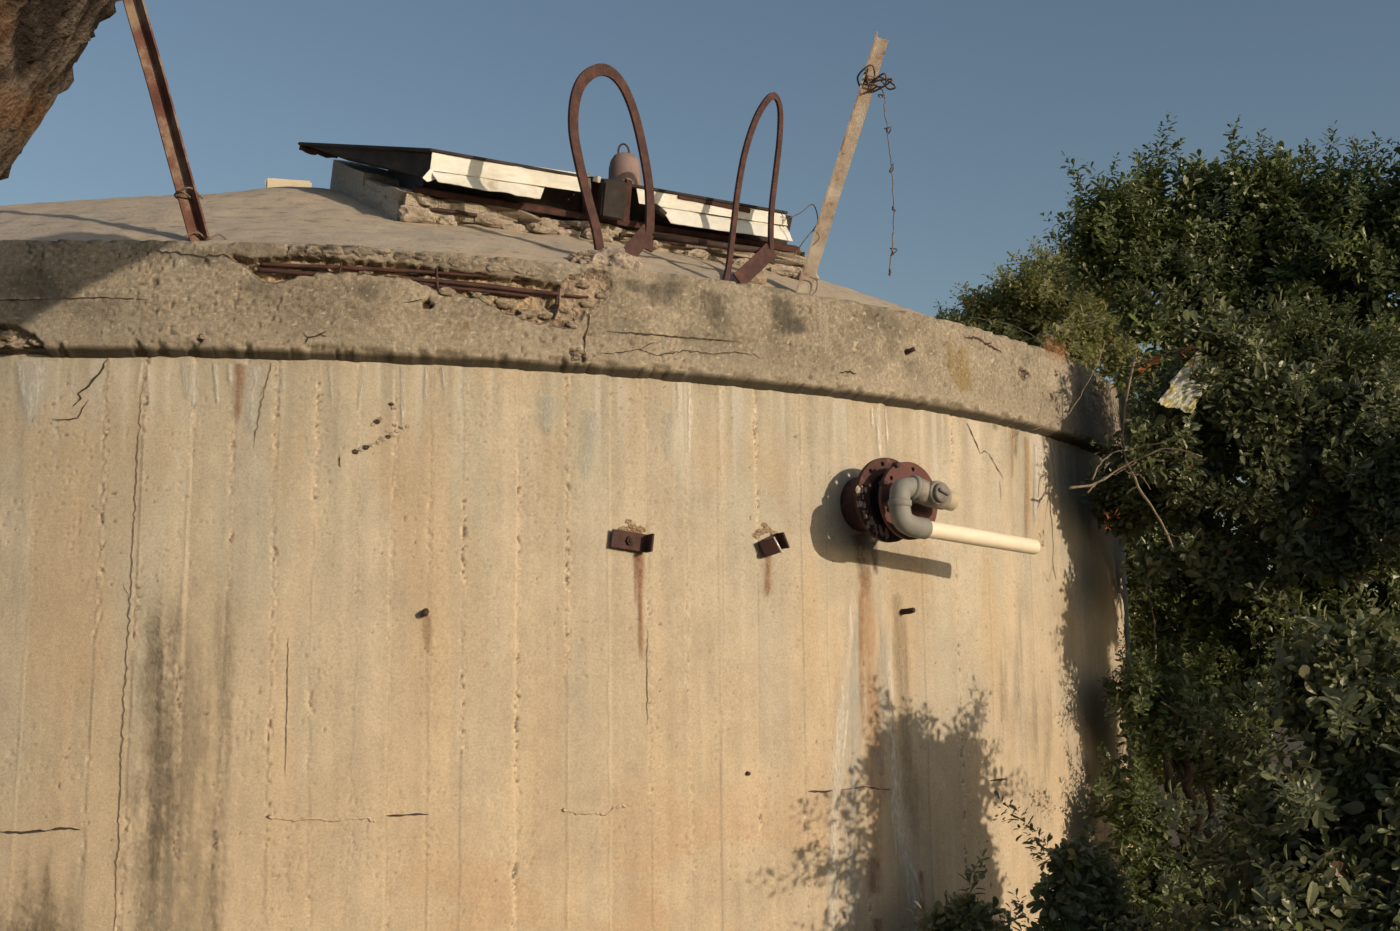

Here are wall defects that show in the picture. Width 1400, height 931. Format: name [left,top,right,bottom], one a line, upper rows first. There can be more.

spalling [229,243,612,329]
spalling [0,324,44,350]
crack [54,357,108,420]
crack [114,366,145,927]
crack [4,826,80,834]
crack [386,811,428,819]